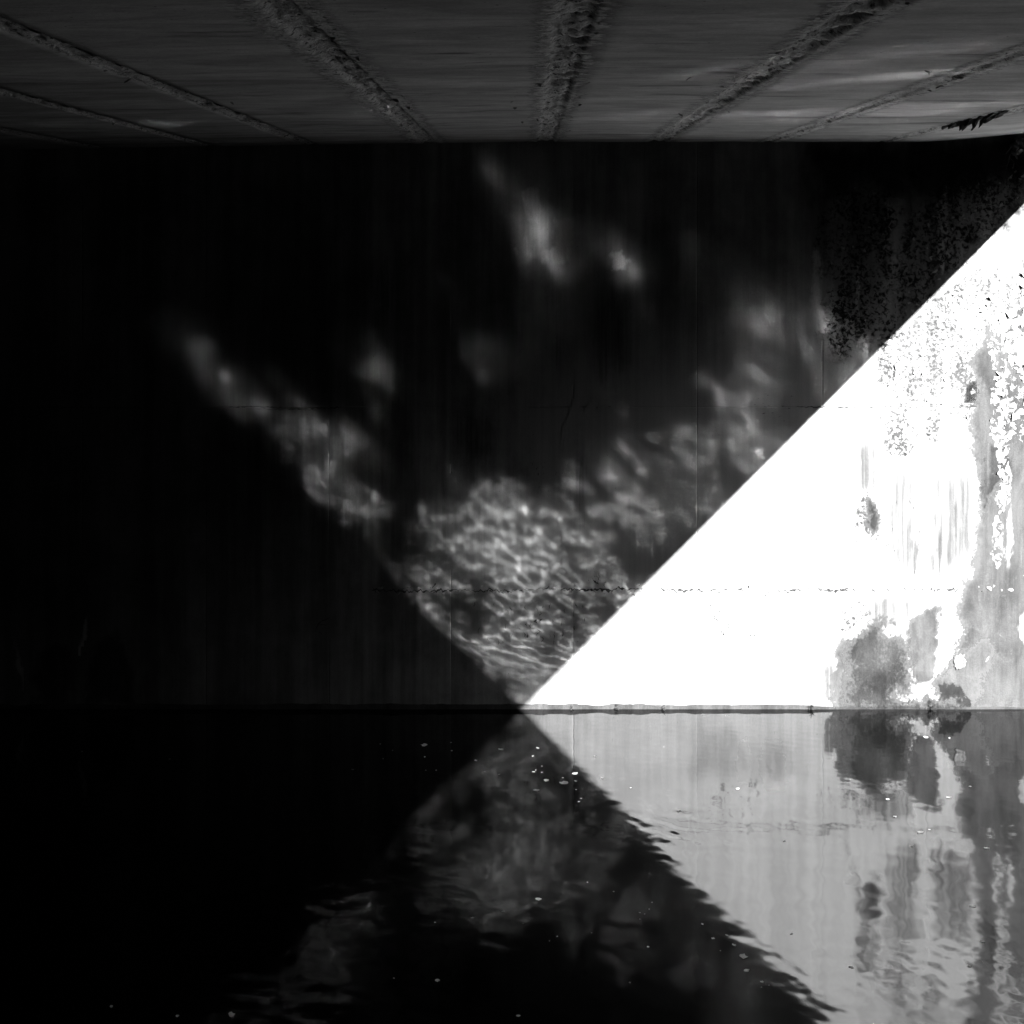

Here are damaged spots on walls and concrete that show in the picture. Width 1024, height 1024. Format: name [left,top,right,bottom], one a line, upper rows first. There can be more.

leakage [807,229,828,342]
leakage [879,198,905,278]
peeling [815,158,1024,569]
leakage [0,289,1024,709]
crack [372,500,1013,645]